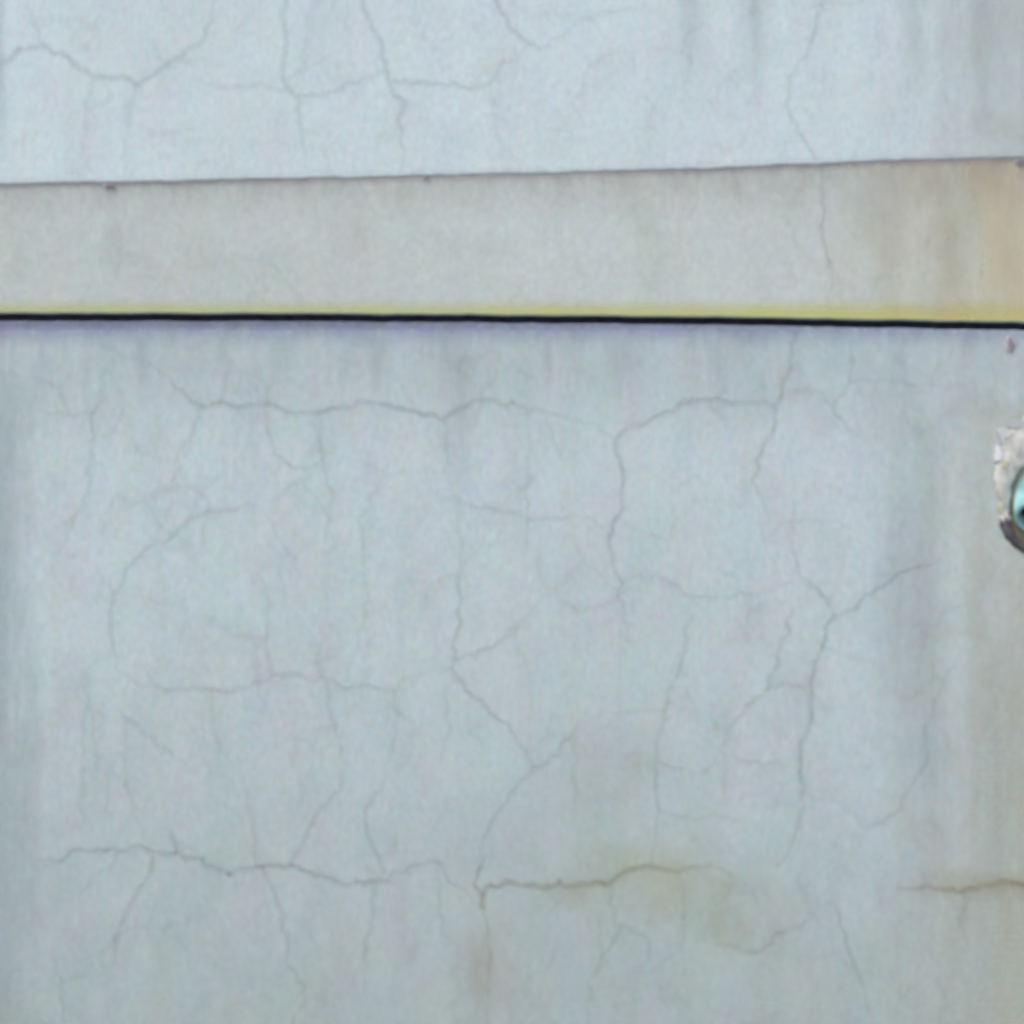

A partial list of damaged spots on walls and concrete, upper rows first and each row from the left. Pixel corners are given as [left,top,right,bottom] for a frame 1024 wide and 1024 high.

spalling [993,417,1024,553]